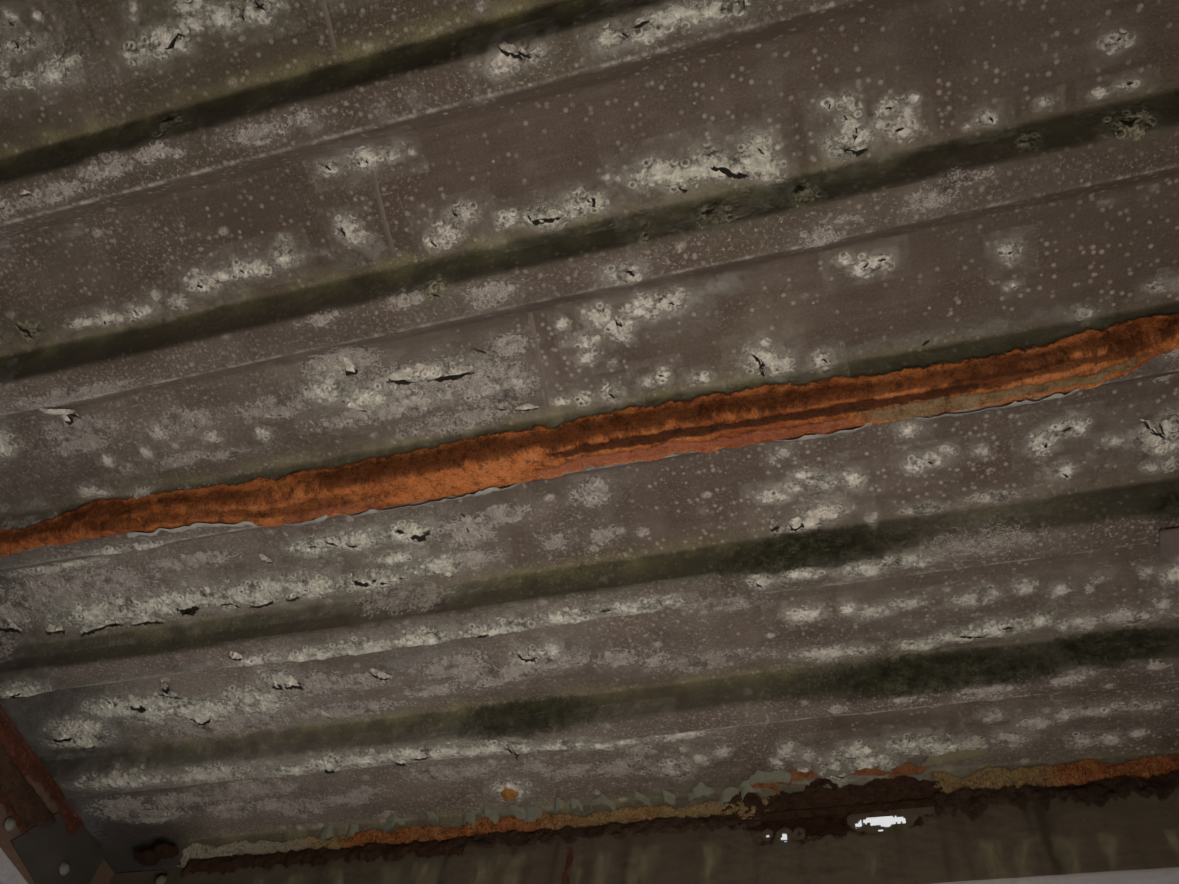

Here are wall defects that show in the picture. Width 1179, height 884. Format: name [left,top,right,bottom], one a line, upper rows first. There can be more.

corrosion [383,288,427,309]
corrosion [462,277,518,312]
corrosion [556,261,690,366]
corrosion [0,308,1179,657]
corrosion [44,595,685,750]
corrosion [788,645,876,662]
corrosion [1050,667,1096,687]
corrosion [1145,660,1173,670]
corrosion [0,681,1179,884]
peeling [633,747,986,806]